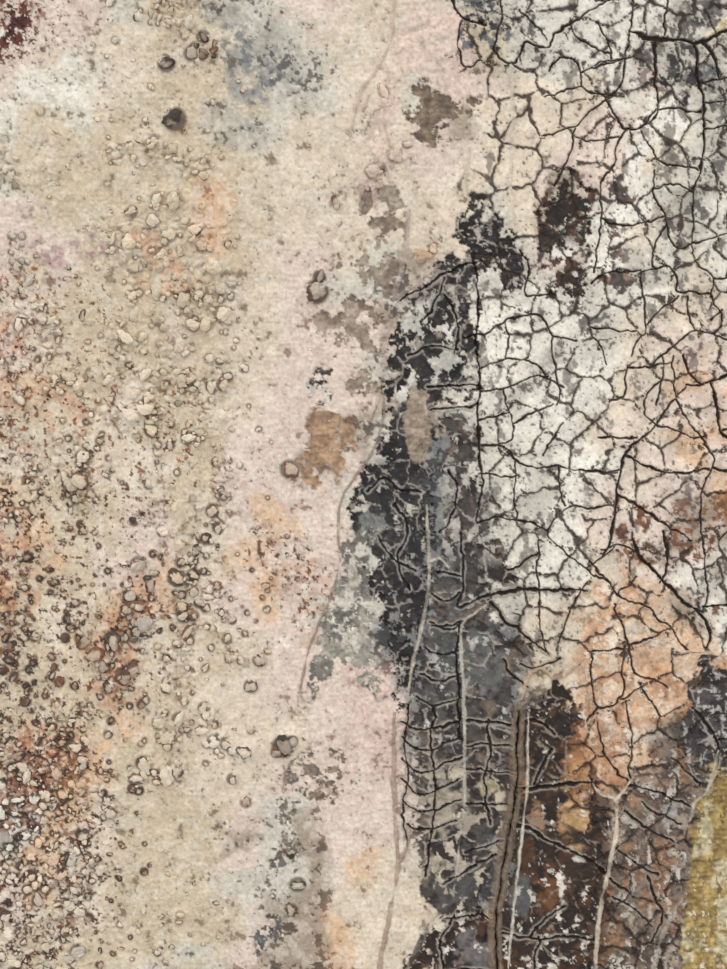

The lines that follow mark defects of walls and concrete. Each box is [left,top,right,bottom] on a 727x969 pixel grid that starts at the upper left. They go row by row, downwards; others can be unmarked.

corrosion [0,0,34,52]
spalling [532,169,654,307]
spalling [295,168,537,969]
spalling [502,654,727,969]